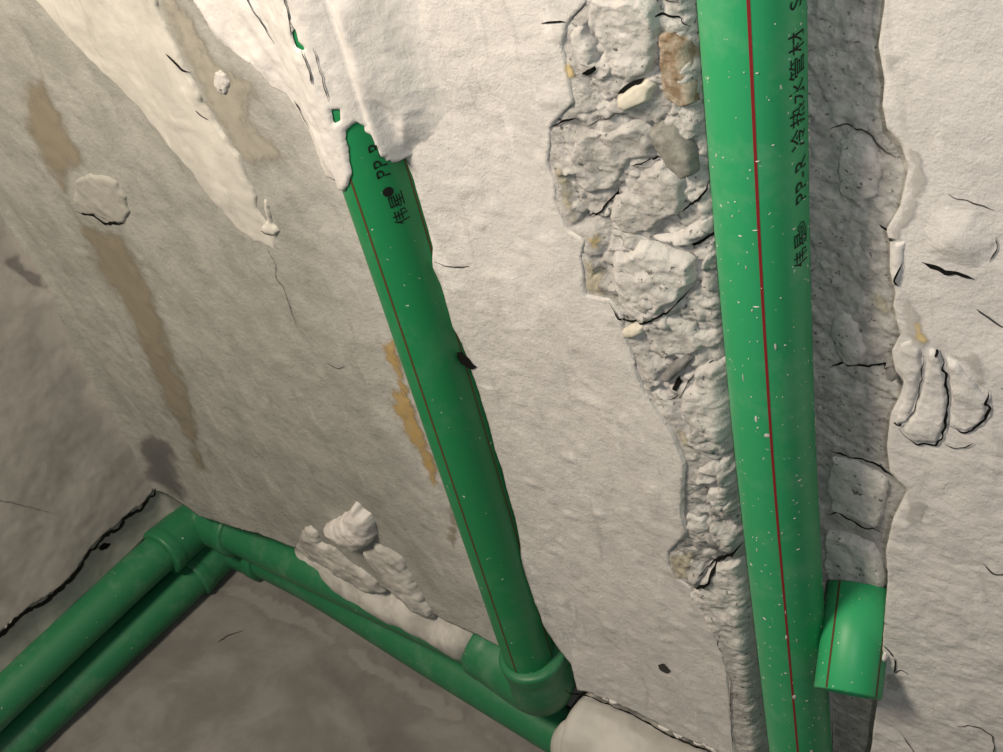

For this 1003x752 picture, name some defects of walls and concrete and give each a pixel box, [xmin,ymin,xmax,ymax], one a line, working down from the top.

leakage [28,85,80,189]
peeling [36,0,275,249]
crack [948,194,993,210]
leakage [83,226,203,468]
spalling [548,0,769,752]
spalling [807,0,991,602]
crack [978,310,1003,328]
leakage [142,439,182,496]
crack [0,489,156,638]
crack [567,691,717,752]
spalling [832,692,877,752]